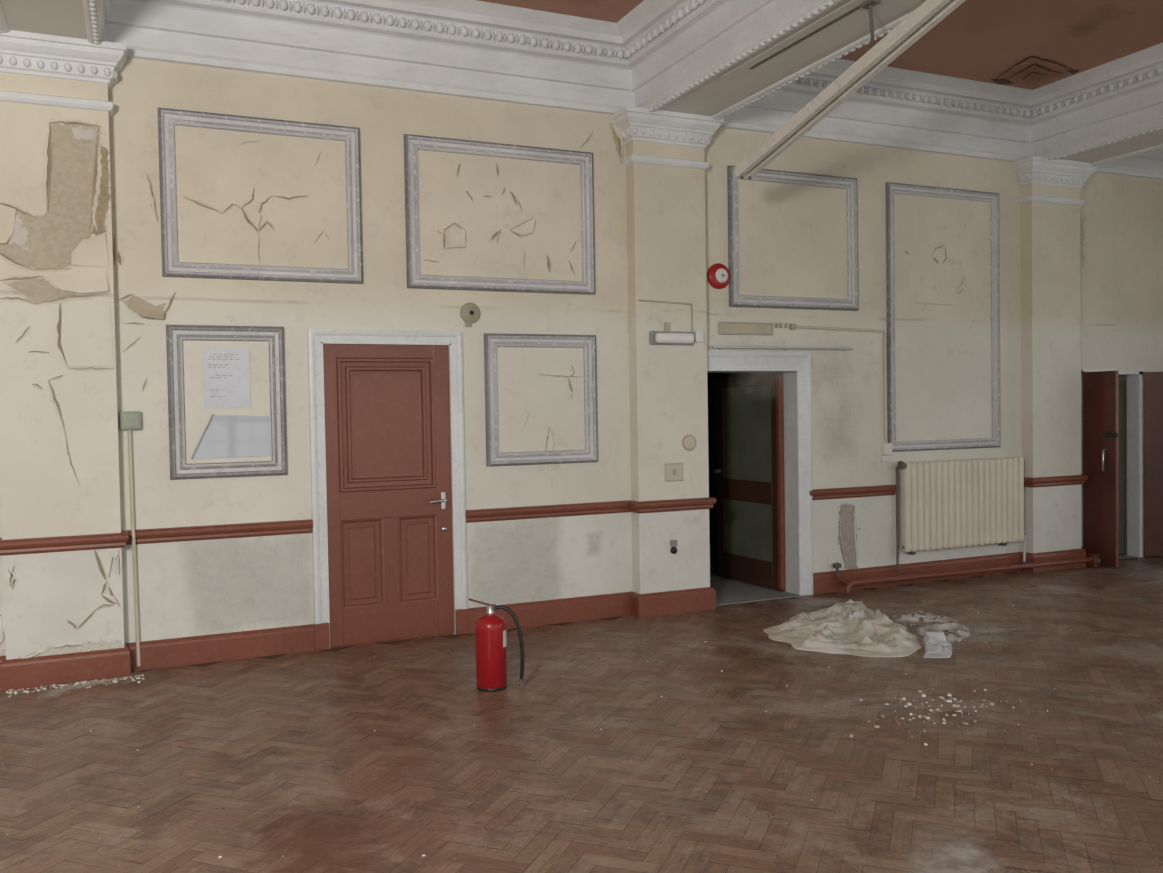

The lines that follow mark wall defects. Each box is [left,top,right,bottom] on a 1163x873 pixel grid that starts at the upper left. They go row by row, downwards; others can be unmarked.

peeling [0,119,176,371]
crack [147,174,158,222]
crack [184,187,308,264]
crack [16,327,80,486]
flaking render [838,504,861,570]
peeling [67,550,120,629]
spalling [19,641,123,659]